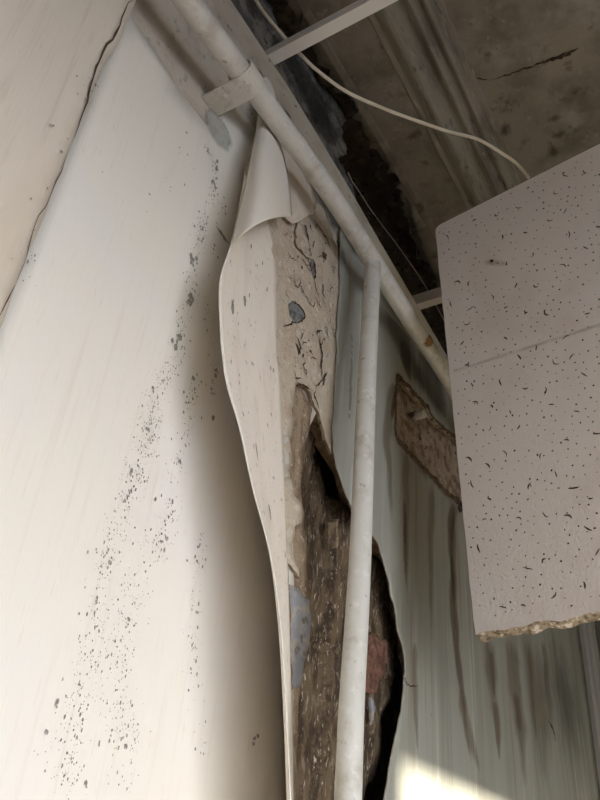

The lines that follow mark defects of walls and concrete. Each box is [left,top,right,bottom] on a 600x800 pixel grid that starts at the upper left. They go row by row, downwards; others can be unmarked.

crack [476,48,578,80]
crack [0,0,133,315]
crack [283,221,336,407]
leakage [44,144,226,795]
flaking render [268,203,341,800]
spalling [394,373,463,513]
spalling [364,650,403,800]